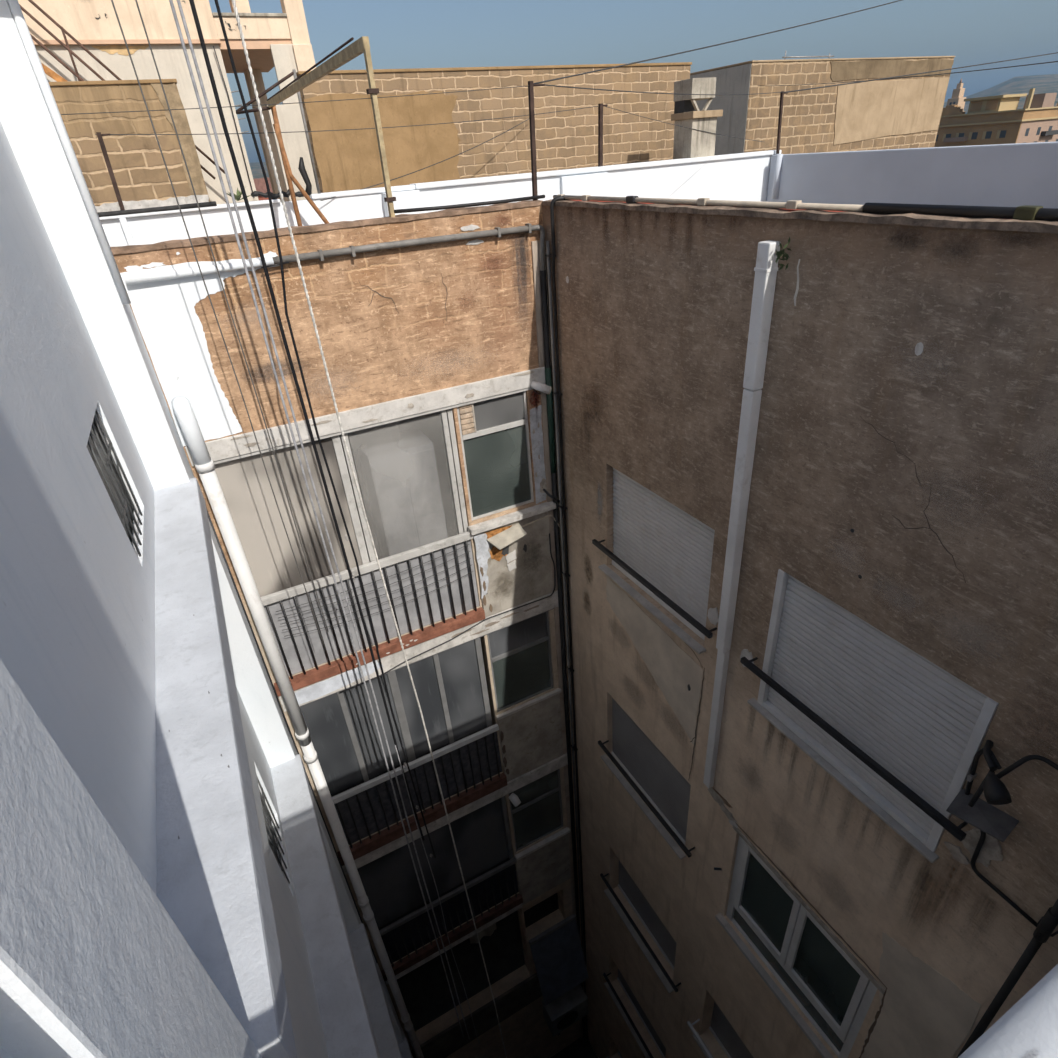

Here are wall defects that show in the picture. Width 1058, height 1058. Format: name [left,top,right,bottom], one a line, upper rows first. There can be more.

crack [860,416,966,583]